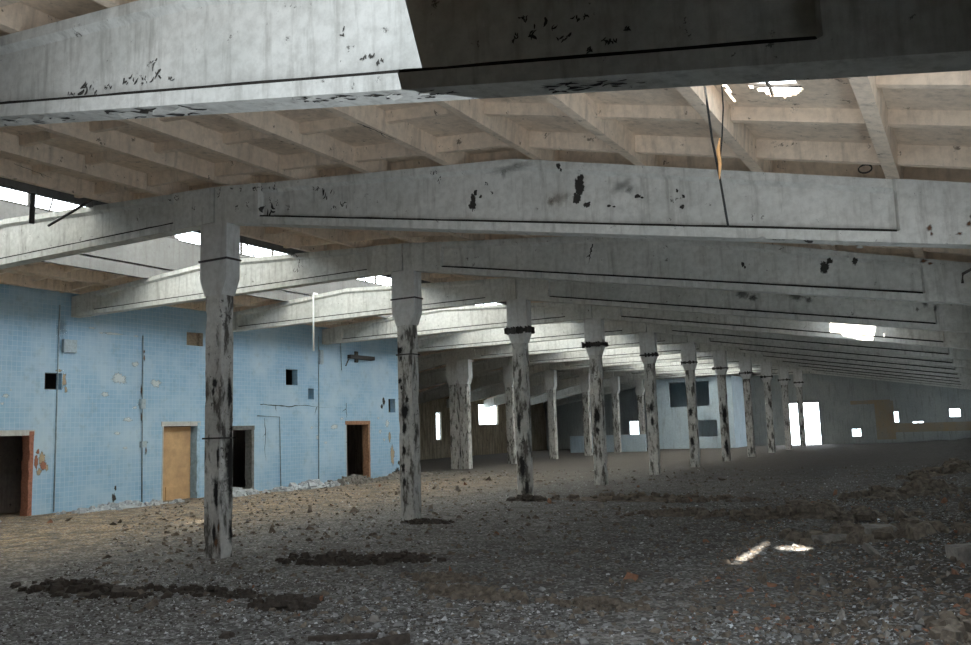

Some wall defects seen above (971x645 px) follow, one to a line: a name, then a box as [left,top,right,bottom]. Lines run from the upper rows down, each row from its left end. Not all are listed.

spalling [742,80,809,99]
flaking render [34,449,48,475]